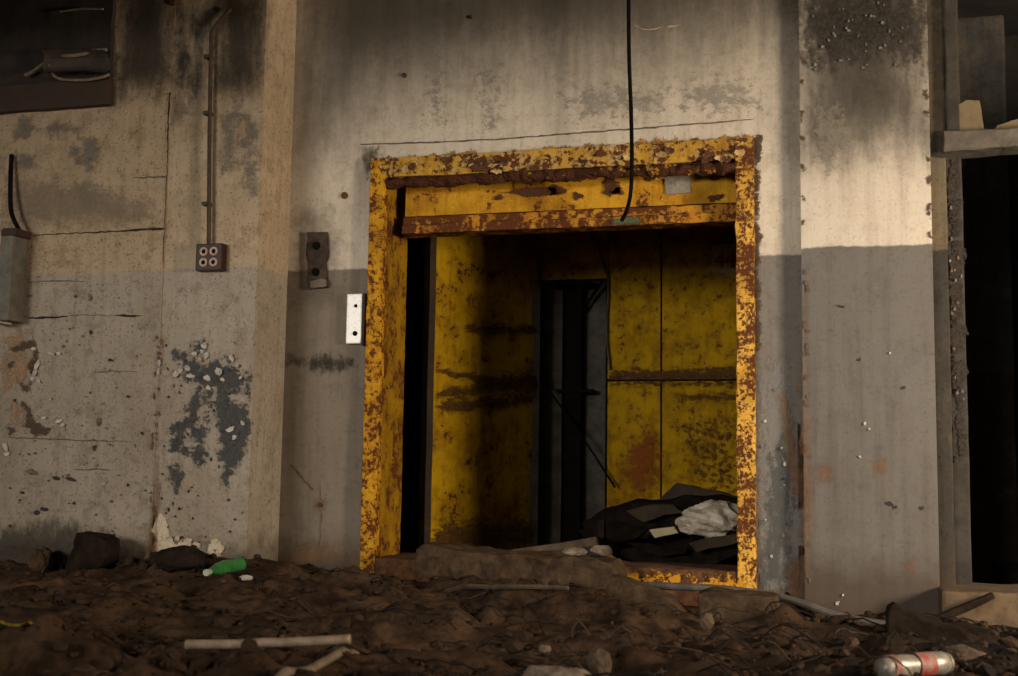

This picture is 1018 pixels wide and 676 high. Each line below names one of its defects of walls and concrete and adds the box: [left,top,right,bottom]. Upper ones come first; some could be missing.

rust [625,136,699,144]
rust [486,184,584,201]
rust [603,177,624,197]
rust [711,134,763,352]
flaking render [0,327,92,456]
rust [436,368,535,414]
peeling [151,338,254,556]
rust [610,365,737,500]
peeling [25,469,76,482]